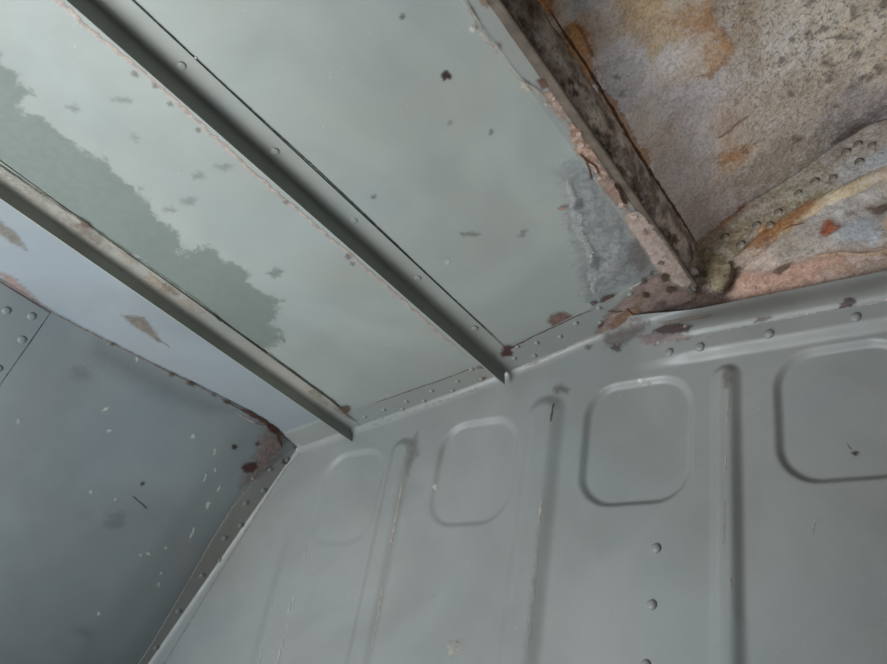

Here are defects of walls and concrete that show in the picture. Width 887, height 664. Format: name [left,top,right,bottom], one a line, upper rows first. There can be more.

peeling [599,174,699,294]
corrosion [819,220,840,236]
corrosion [501,267,735,357]
corrosion [0,274,297,485]